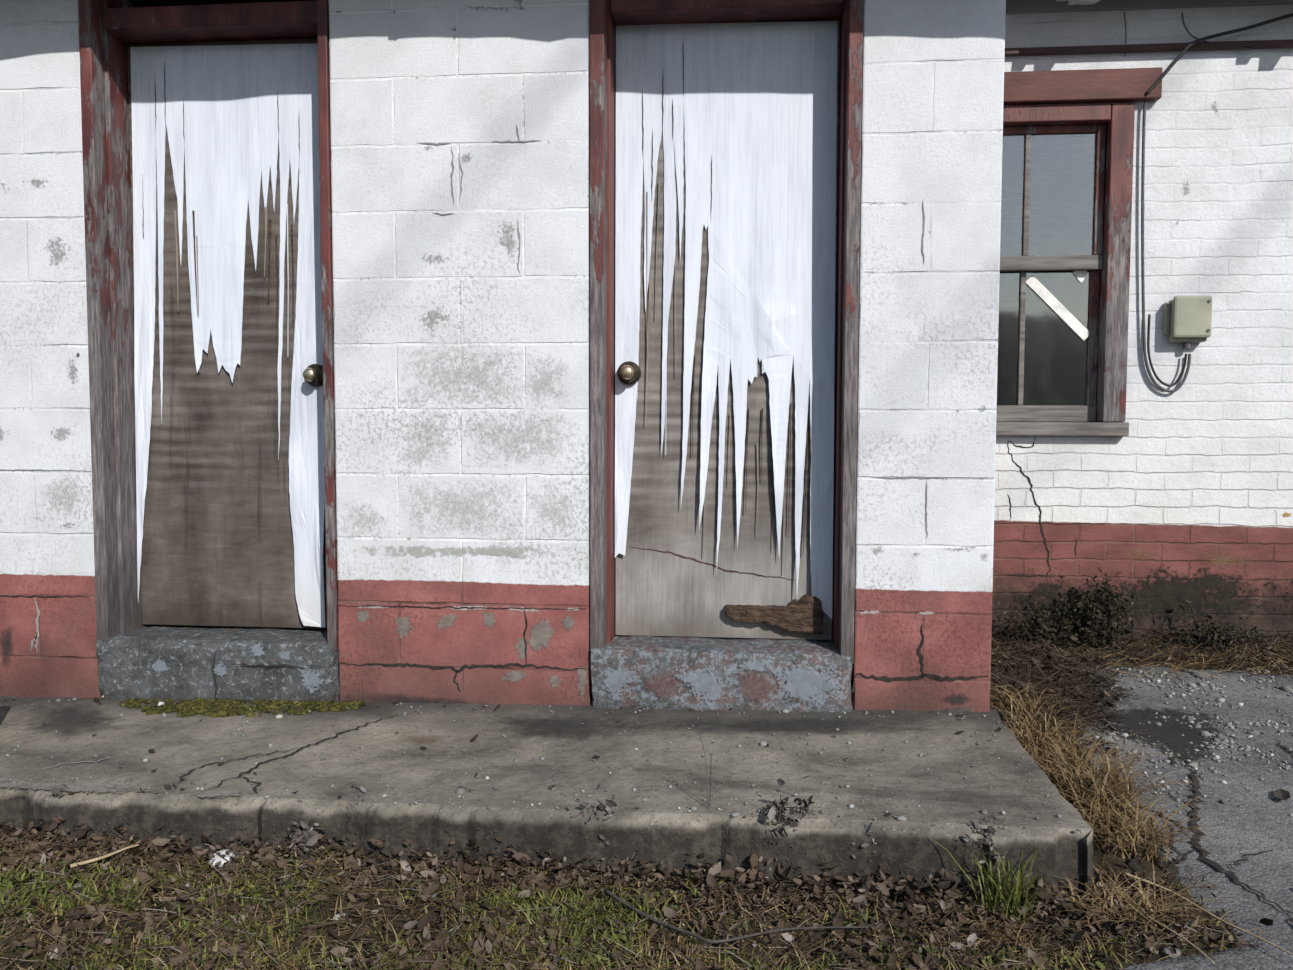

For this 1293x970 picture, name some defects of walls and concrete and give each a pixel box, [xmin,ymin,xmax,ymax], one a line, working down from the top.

crack [1007,436,1077,588]
water stain [366,545,542,558]
peeling [355,605,414,639]
crack [211,605,587,696]
peeling [436,606,496,629]
peeling [500,607,578,682]
peeling [577,660,845,705]
crack [851,624,989,710]
water stain [1013,582,1084,628]
water stain [1117,563,1293,628]
crack [172,713,399,793]
crack [1120,753,1293,923]